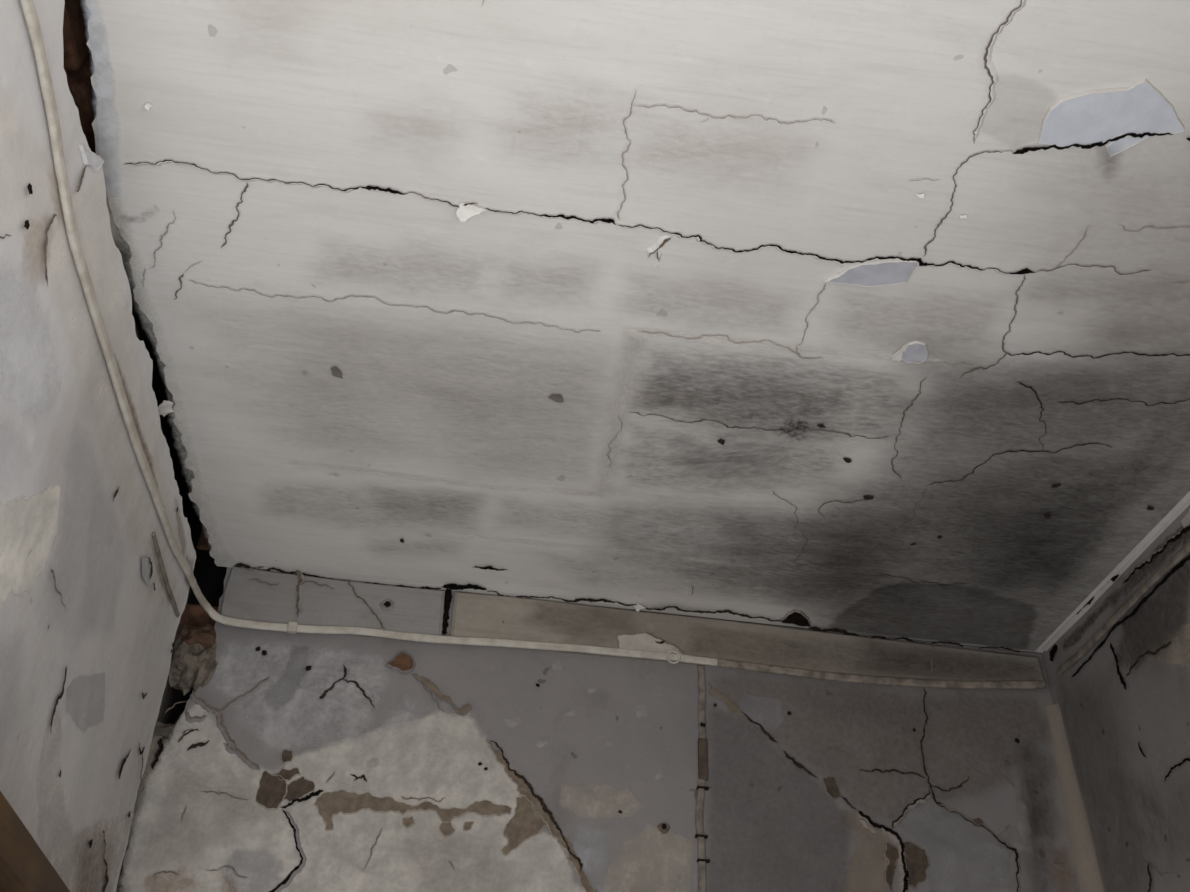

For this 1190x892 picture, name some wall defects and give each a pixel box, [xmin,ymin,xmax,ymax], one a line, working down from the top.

peeling [1038,78,1185,157]
crack [124,0,1190,530]
peeling [825,259,917,287]
peeling [891,340,928,364]
crack [773,491,866,561]
crack [234,563,1020,655]
crack [1049,524,1190,690]
peeling [213,643,598,892]
crack [744,714,818,778]
crack [842,689,1022,892]